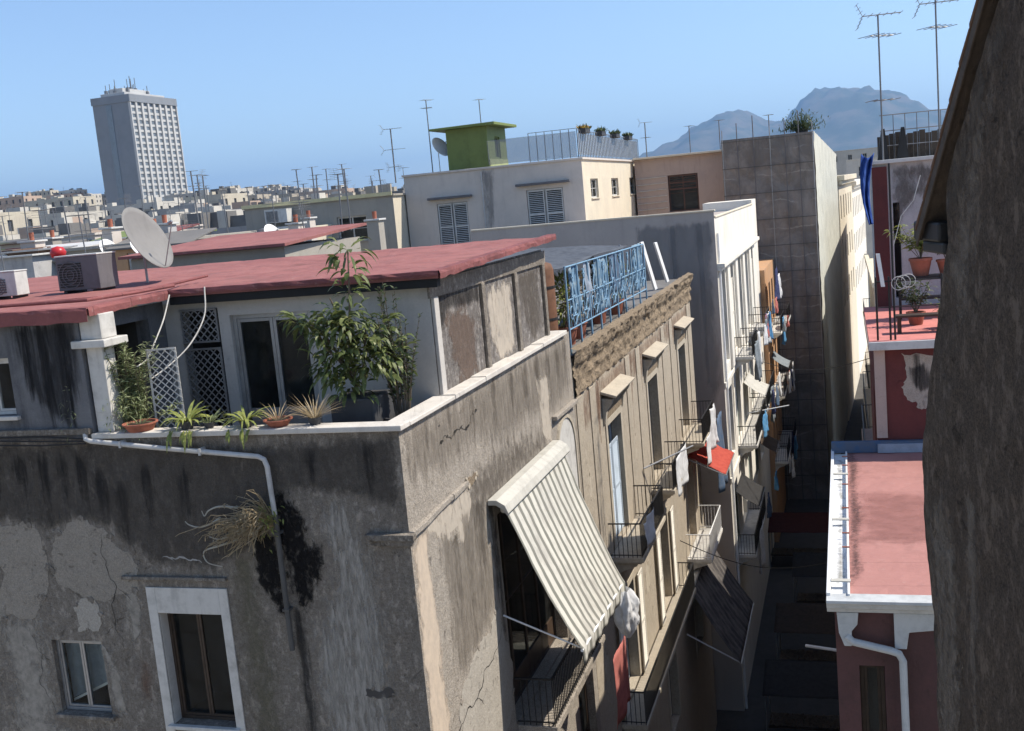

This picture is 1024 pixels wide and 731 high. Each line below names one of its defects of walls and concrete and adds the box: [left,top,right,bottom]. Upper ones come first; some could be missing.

water stain [438,288,478,326]
water stain [15,325,76,426]
peeling [895,350,933,409]
water stain [849,460,861,576]
peeling [0,515,139,632]
water stain [0,438,394,731]
crack [460,630,502,729]